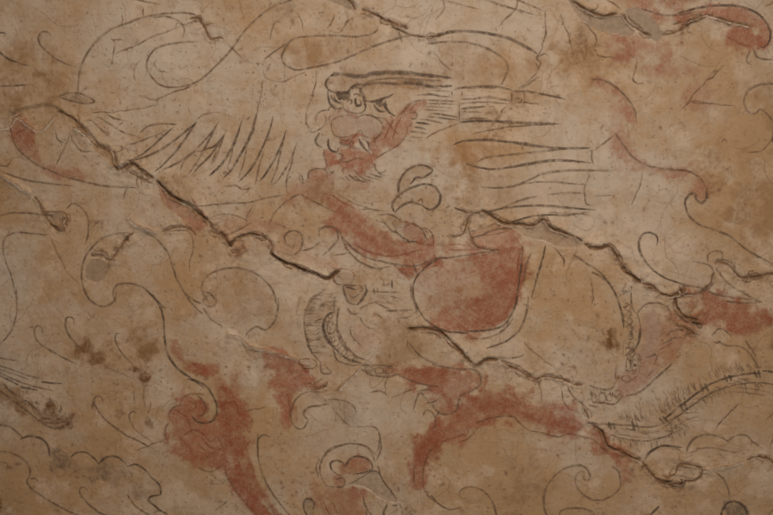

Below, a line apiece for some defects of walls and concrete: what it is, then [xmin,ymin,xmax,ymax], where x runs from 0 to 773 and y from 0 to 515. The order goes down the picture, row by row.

crack [329,0,444,39]
crack [571,0,749,36]
crack [0,110,340,280]
crack [452,208,773,335]
crack [407,327,582,386]
crack [584,409,773,489]